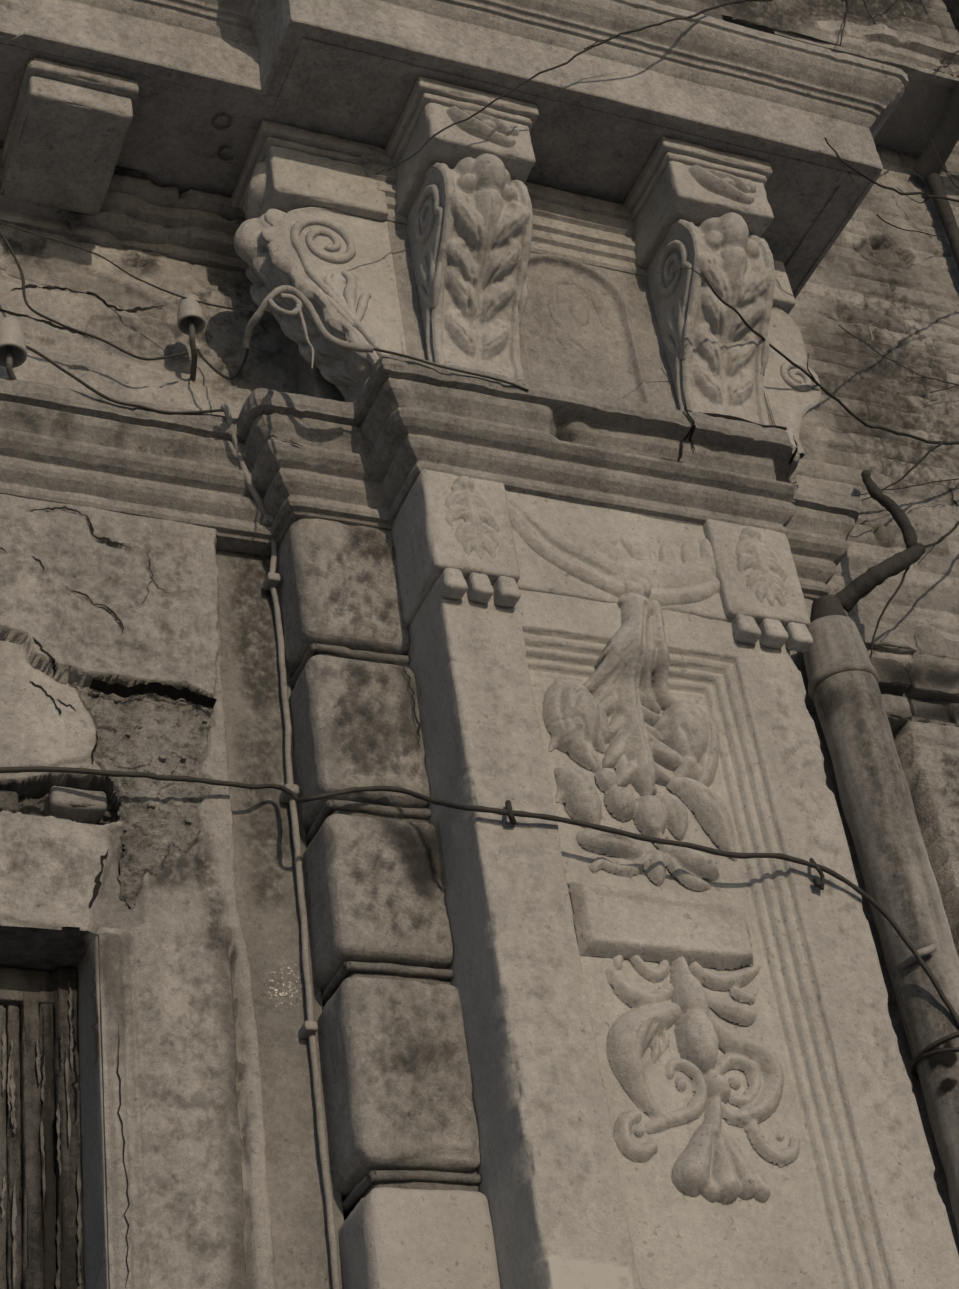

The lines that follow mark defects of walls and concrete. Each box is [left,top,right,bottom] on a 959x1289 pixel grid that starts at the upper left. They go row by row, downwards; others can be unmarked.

crack [0,284,167,339]
crack [677,402,798,485]
crack [0,506,171,632]
spalling [18,793,49,817]
spalling [69,682,213,909]
crack [89,850,108,907]
water stain [386,819,443,888]
crack [89,939,130,1287]